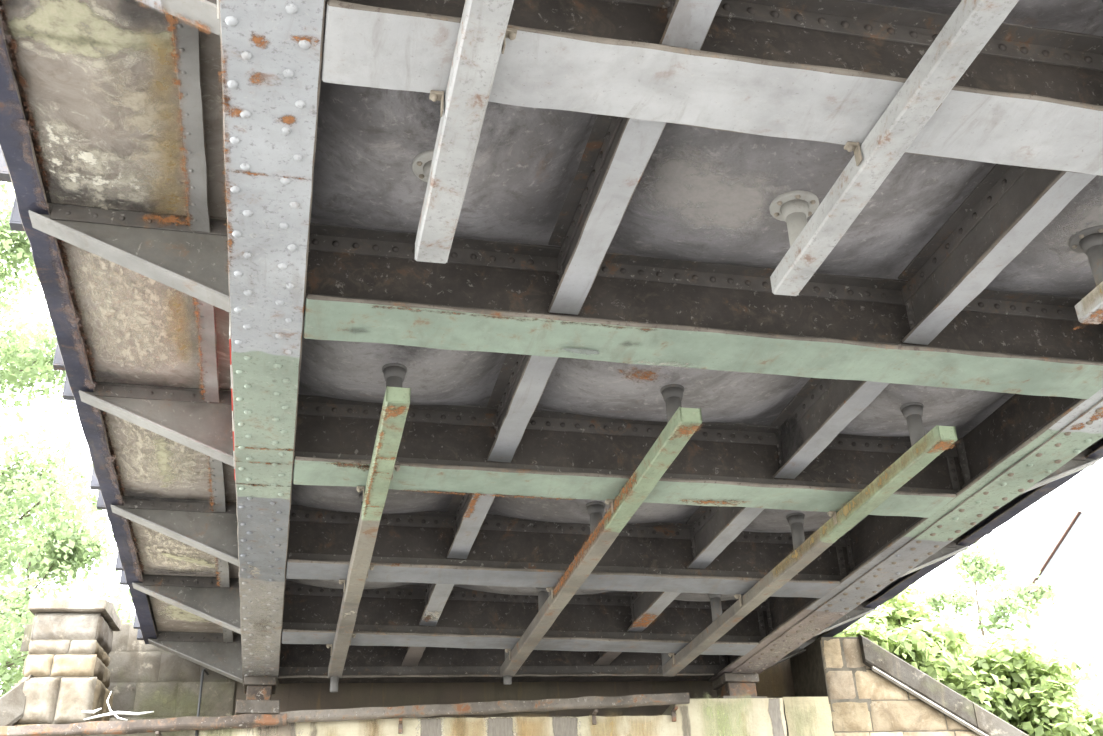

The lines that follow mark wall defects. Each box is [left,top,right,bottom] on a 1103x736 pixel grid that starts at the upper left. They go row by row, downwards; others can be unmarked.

corrosion [251,32,270,48]
corrosion [218,51,242,117]
leakage [7,0,186,210]
corrosion [141,1,209,226]
corrosion [1072,407,1103,430]
corrosion [330,406,408,515]
corrosion [553,473,637,595]
leakage [247,722,317,736]
leakage [417,718,443,736]
leakage [484,717,516,736]
leakage [552,717,581,736]
leakage [680,706,691,736]